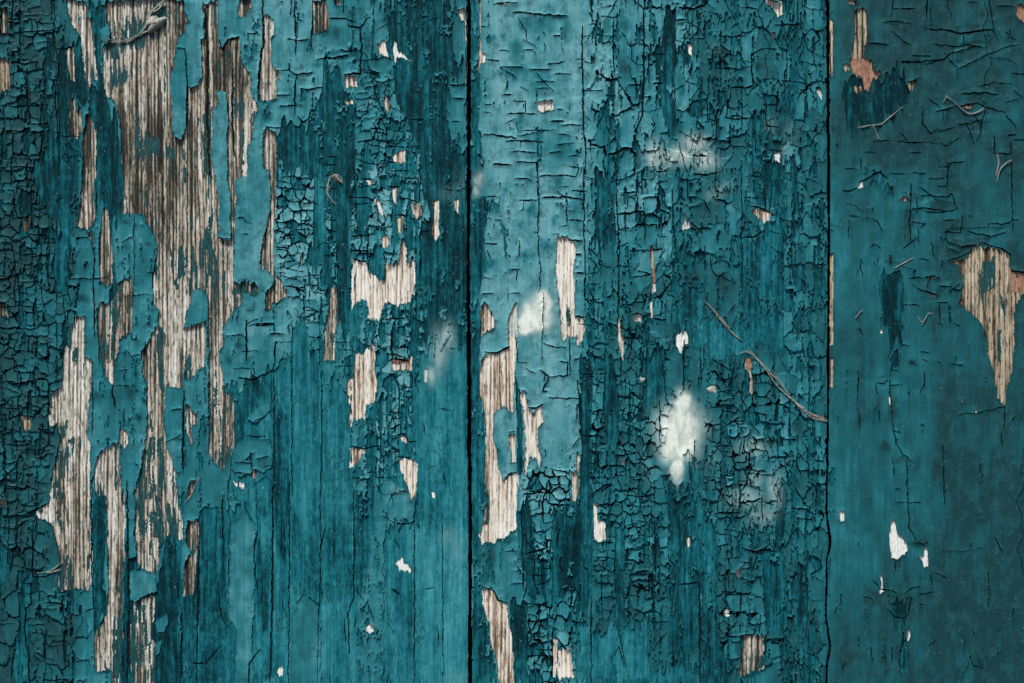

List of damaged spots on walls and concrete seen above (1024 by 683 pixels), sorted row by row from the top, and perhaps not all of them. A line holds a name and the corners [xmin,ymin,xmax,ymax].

peeling [842,0,916,137]
crack [0,0,107,683]
peeling [34,0,543,683]
crack [178,0,461,683]
peeling [549,235,624,621]
peeling [666,483,765,683]
crack [449,0,1024,683]
peeling [889,519,928,568]
peeling [950,243,1024,405]